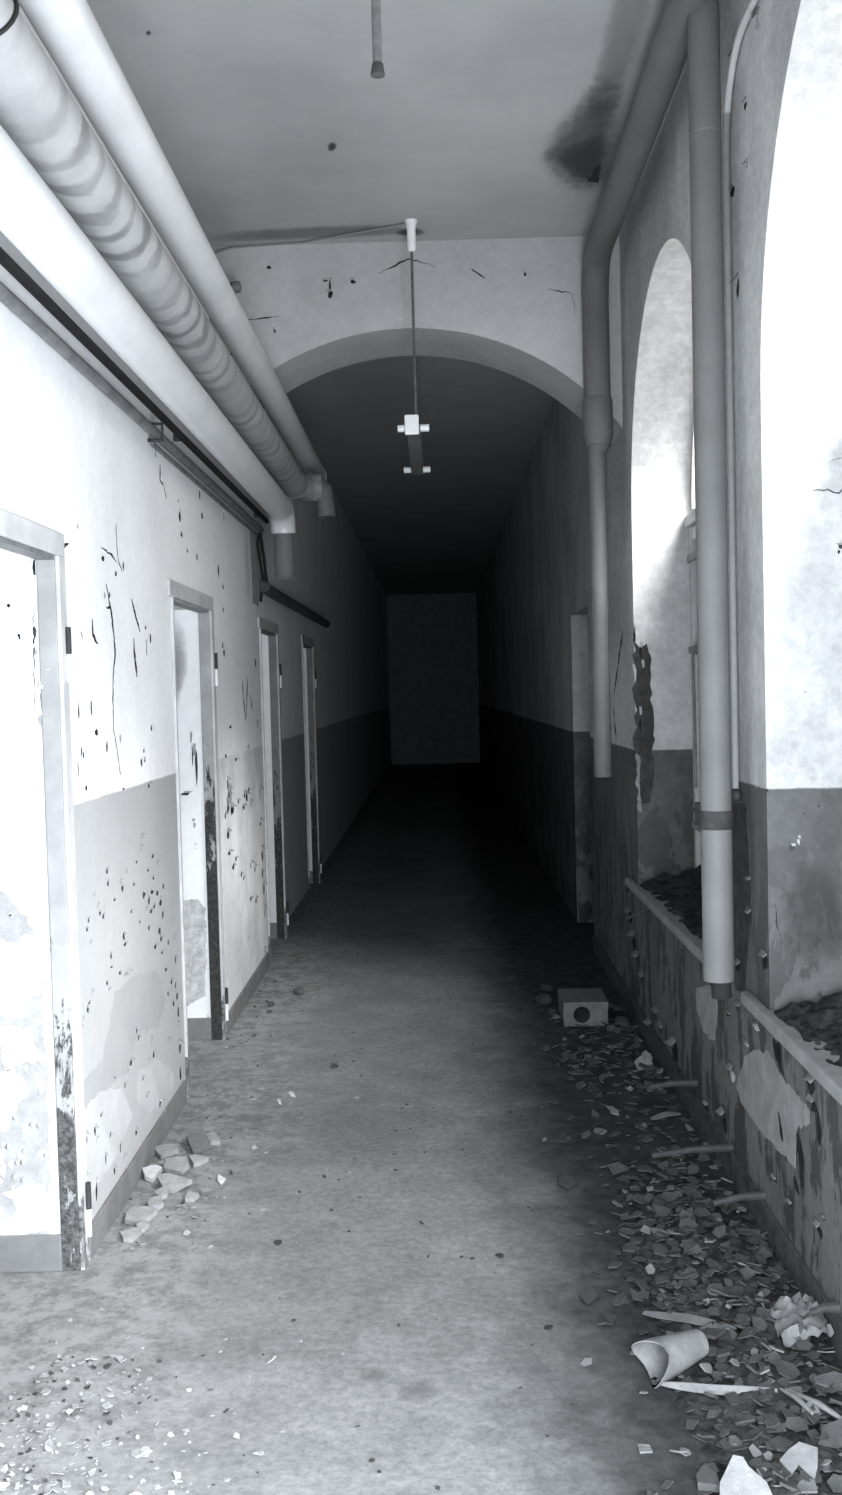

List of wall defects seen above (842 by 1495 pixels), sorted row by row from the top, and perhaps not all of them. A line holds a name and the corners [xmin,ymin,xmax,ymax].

damp [551,101,611,179]
crack [64,533,147,775]
peeling [181,732,198,795]
peeling [0,890,57,1235]
peeling [813,1371,842,1393]
peeling [818,1418,842,1449]